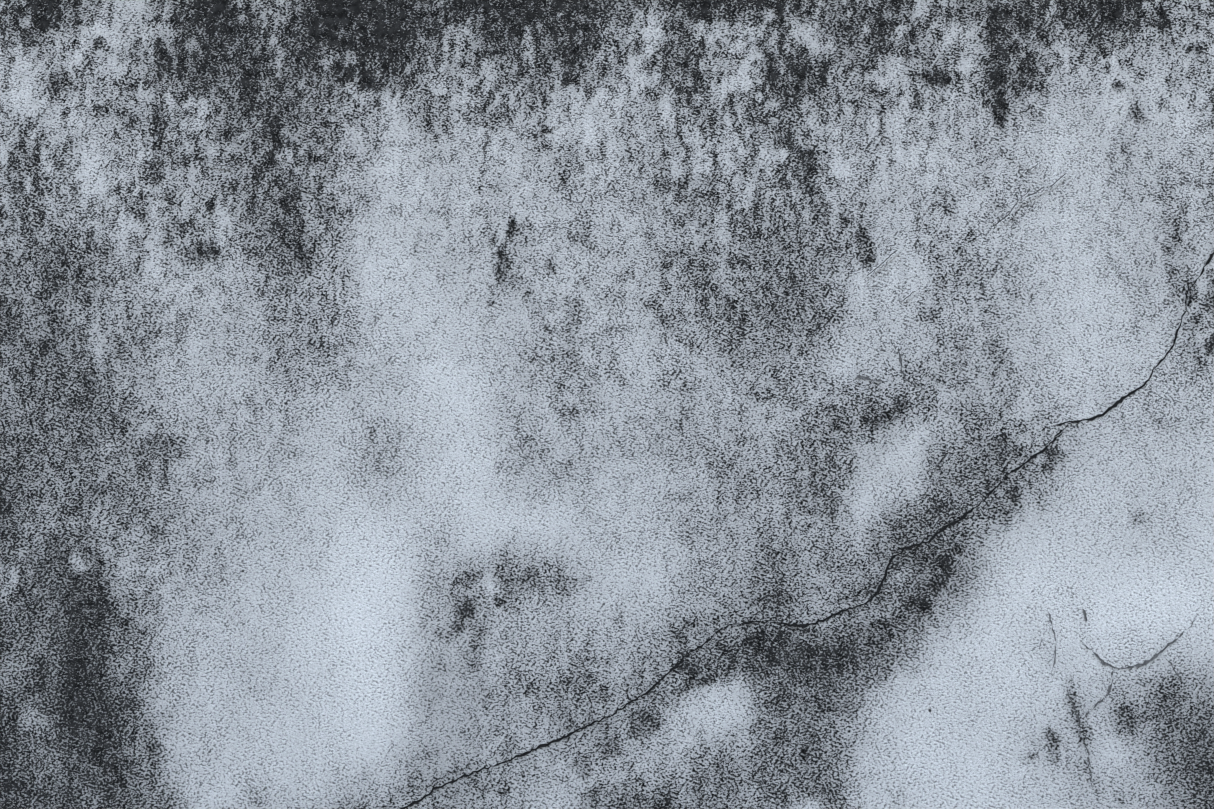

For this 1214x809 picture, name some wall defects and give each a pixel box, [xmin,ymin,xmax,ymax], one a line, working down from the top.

damp [619,141,647,179]
damp [1121,90,1147,175]
damp [480,180,625,432]
damp [916,220,1009,386]
damp [1136,172,1214,383]
crack [400,252,1214,809]
damp [435,550,592,669]
damp [1046,728,1061,763]
damp [1065,680,1093,745]
damp [1113,675,1214,809]